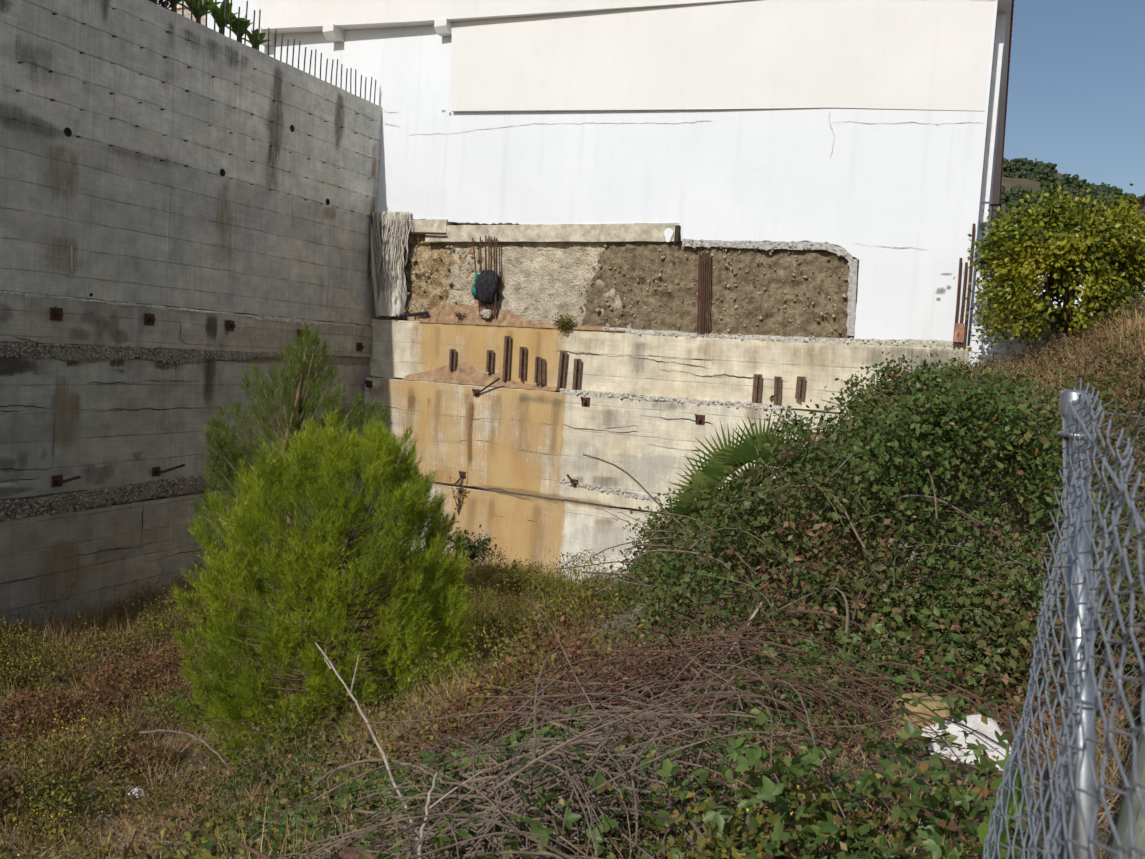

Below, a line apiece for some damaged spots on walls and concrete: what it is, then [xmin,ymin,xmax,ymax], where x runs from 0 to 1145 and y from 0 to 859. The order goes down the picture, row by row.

damp [269,70,282,155]
crack [384,111,707,136]
crack [829,114,980,160]
spalling [471,236,501,316]
spalling [603,224,976,347]
corrosion [391,322,565,580]